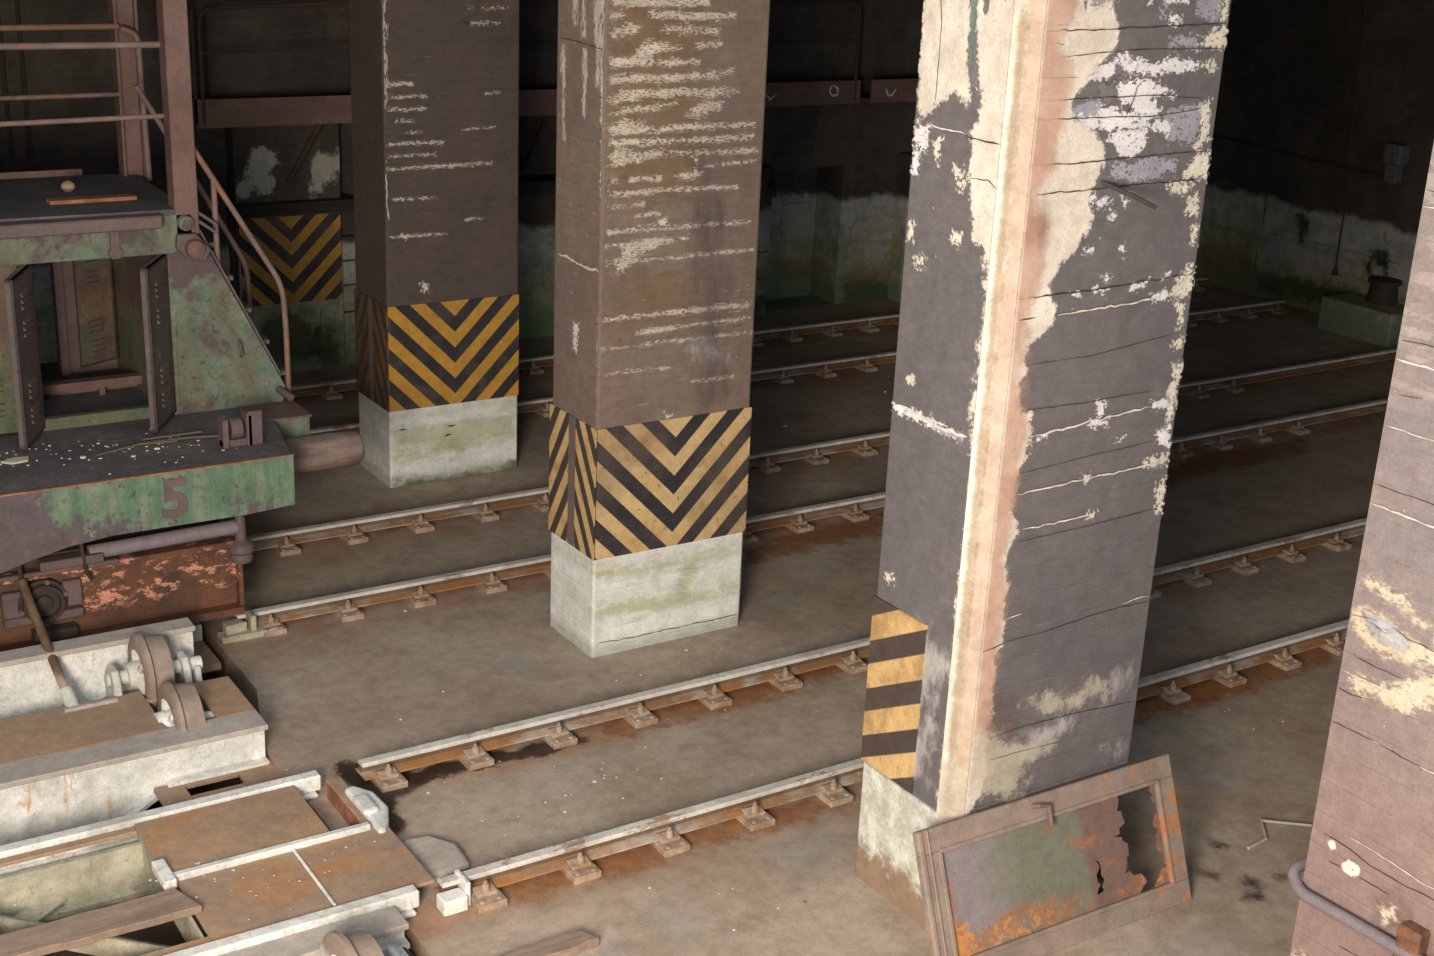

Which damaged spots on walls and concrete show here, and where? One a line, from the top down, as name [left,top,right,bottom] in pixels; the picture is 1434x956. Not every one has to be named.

peeling [462,6,508,27]
peeling [560,0,759,229]
water stain [1257,212,1409,303]
peeling [572,321,580,353]
rust [976,0,1074,732]
peeling [892,0,1230,820]
spalling [1347,573,1434,716]